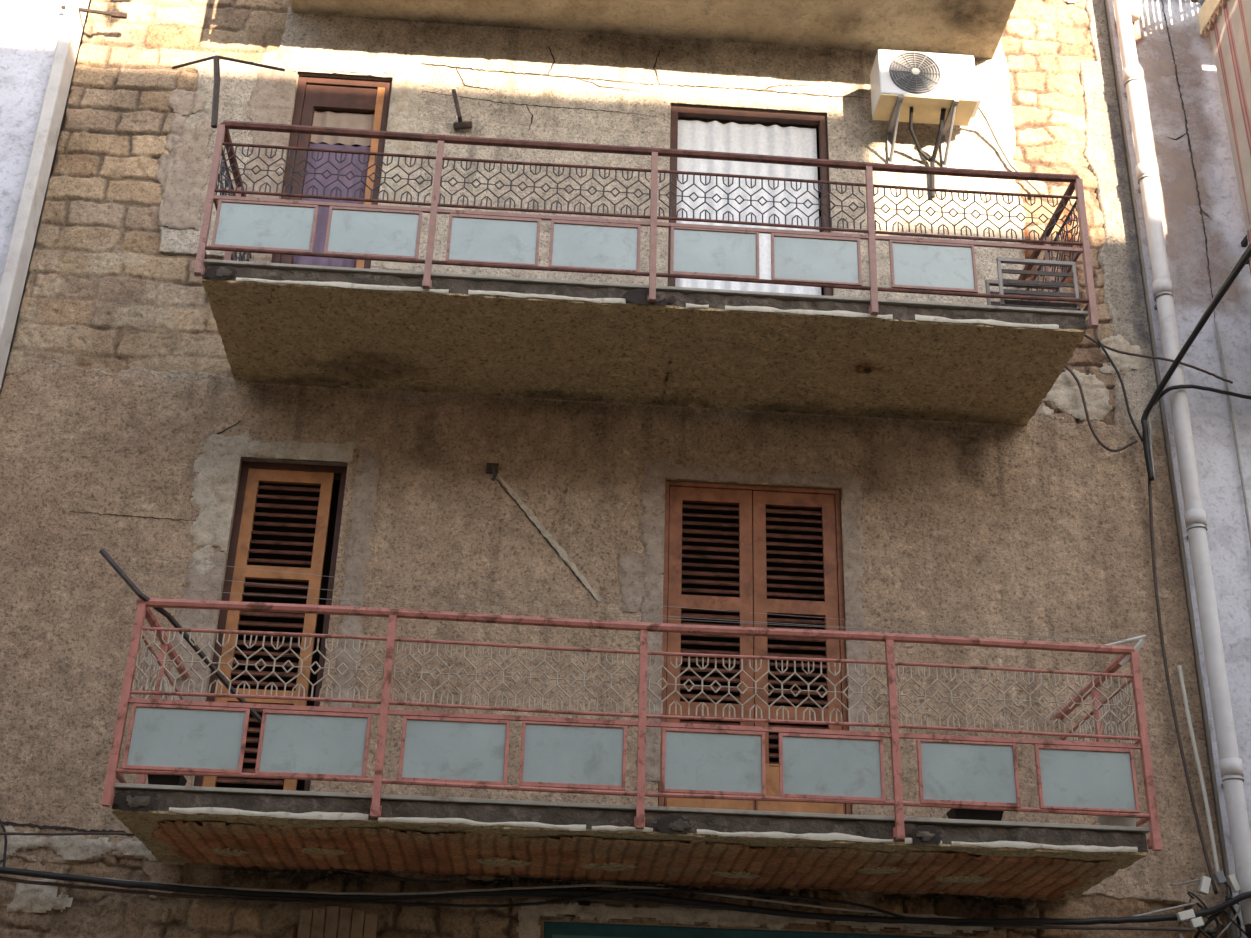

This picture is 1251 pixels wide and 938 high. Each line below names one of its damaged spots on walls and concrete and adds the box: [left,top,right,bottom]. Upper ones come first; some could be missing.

crack [421,47,865,129]
crack [1161,0,1215,321]